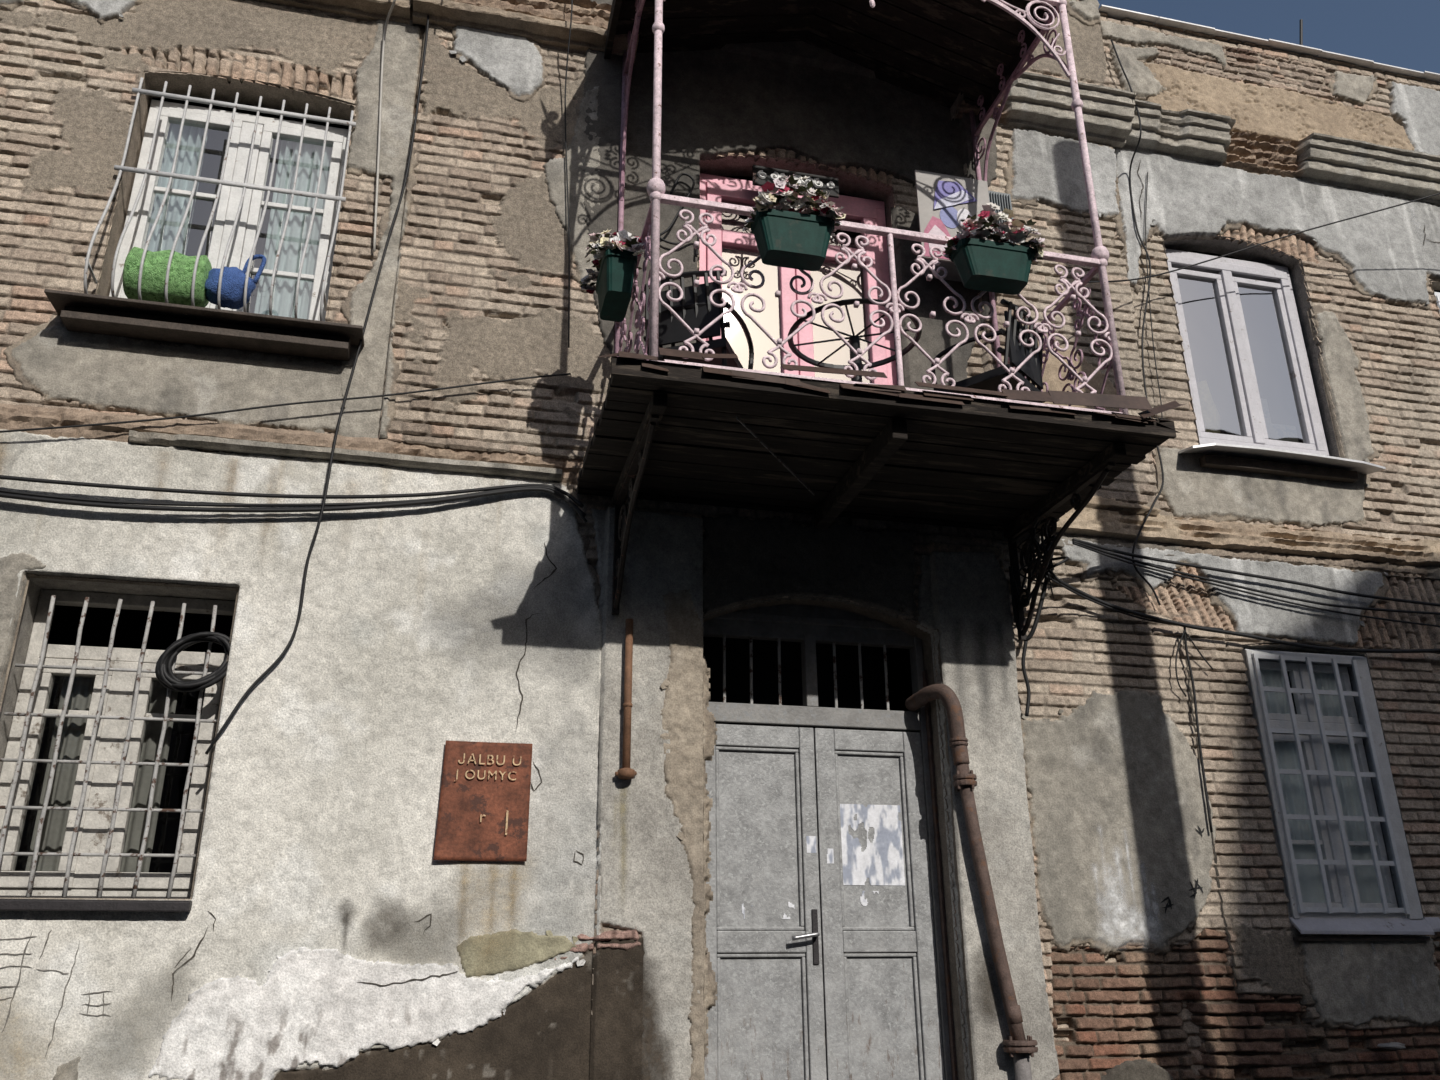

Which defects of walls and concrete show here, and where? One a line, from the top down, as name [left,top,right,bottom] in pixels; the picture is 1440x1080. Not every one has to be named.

flaking render [1066,0,1440,156]
flaking render [3,15,425,438]
flaking render [542,41,1440,391]
flaking render [1024,335,1119,412]
flaking render [1085,305,1380,529]
crack [516,542,557,729]
peeling [148,929,641,1080]
spalling [1046,928,1440,1080]